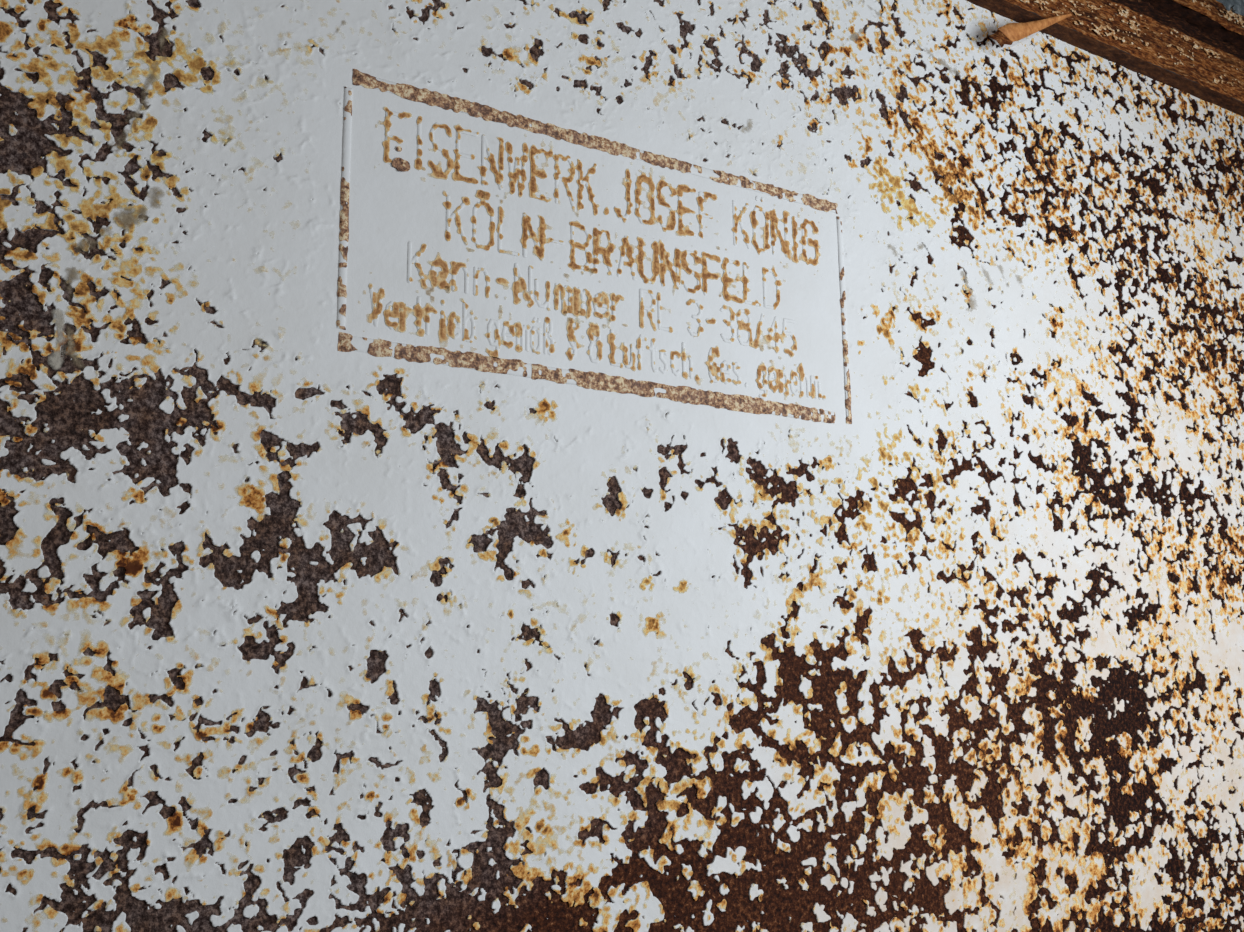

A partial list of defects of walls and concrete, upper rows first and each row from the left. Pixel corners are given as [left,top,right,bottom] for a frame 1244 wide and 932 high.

corrosion [184,60,241,93]
corrosion [280,39,323,54]
corrosion [987,14,1072,48]
corrosion [202,119,233,146]
corrosion [842,111,1027,236]
corrosion [74,119,217,346]
peeling [295,367,660,660]
peeling [641,435,692,512]
peeling [299,639,404,737]
peeling [412,673,451,782]
peeling [546,693,622,757]
peeling [240,731,329,852]